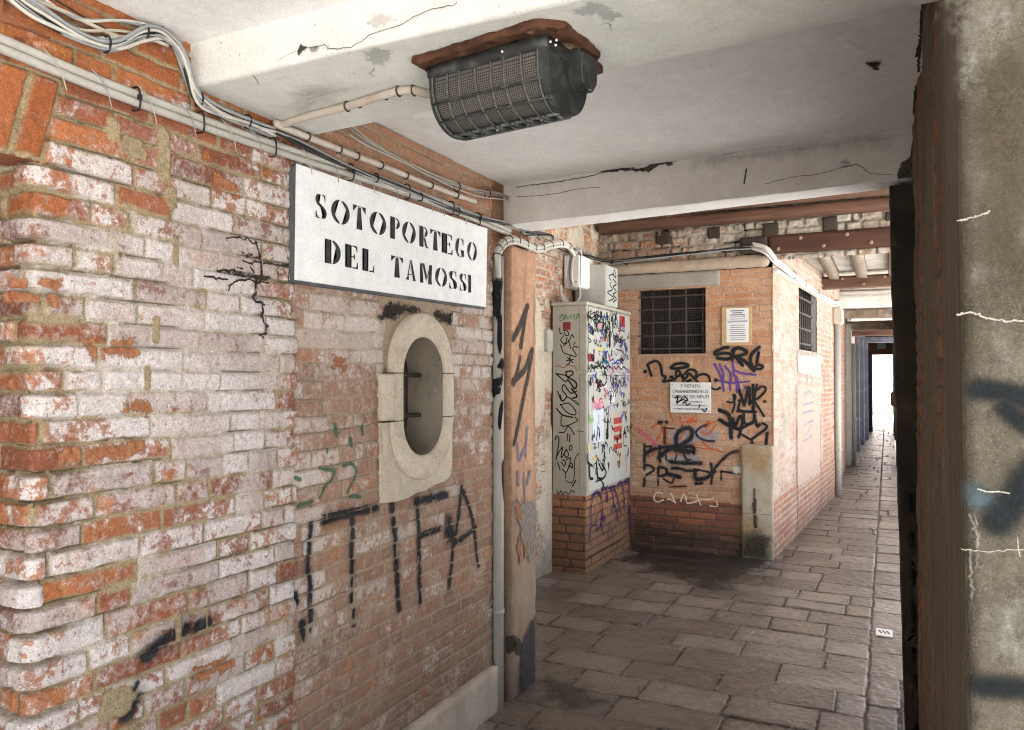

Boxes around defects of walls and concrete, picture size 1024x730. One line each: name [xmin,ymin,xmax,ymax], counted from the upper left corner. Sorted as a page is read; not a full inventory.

crack [279,2,457,60]
crack [516,161,675,197]
crack [765,164,891,184]
crack [204,236,290,338]
flaking render [512,498,538,564]